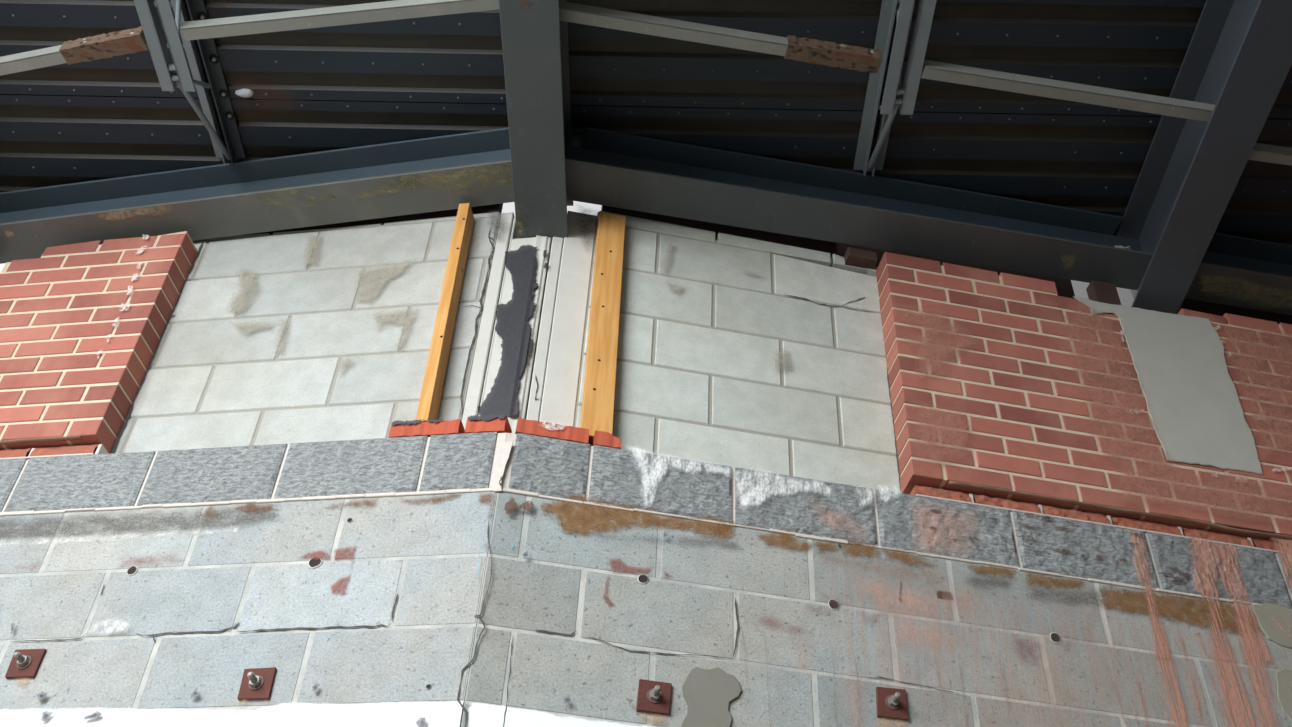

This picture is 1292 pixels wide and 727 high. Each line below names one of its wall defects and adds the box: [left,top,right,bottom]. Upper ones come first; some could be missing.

corrosion [542,495,732,536]
leakage [629,448,830,506]
leakage [859,485,900,505]
corrosion [1028,574,1082,588]
crack [457,520,739,727]
corrosion [1101,589,1260,634]